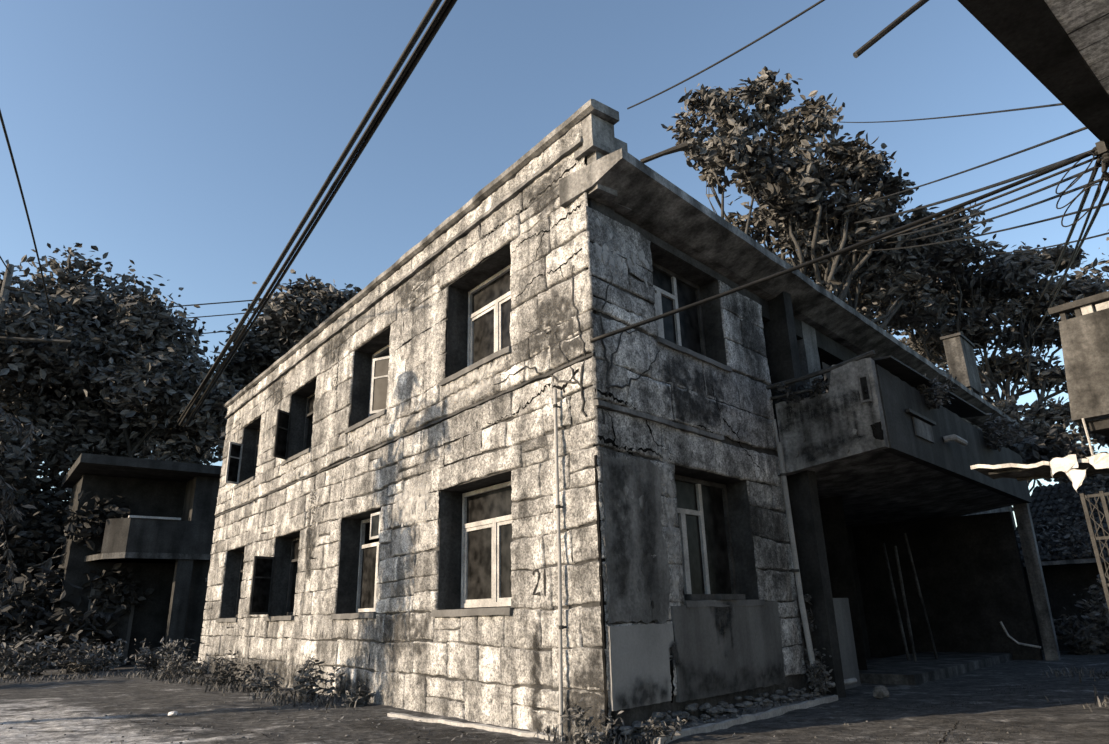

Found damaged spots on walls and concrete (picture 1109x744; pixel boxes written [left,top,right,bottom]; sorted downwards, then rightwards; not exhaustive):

crack [487,369,671,461]
crack [692,391,765,472]